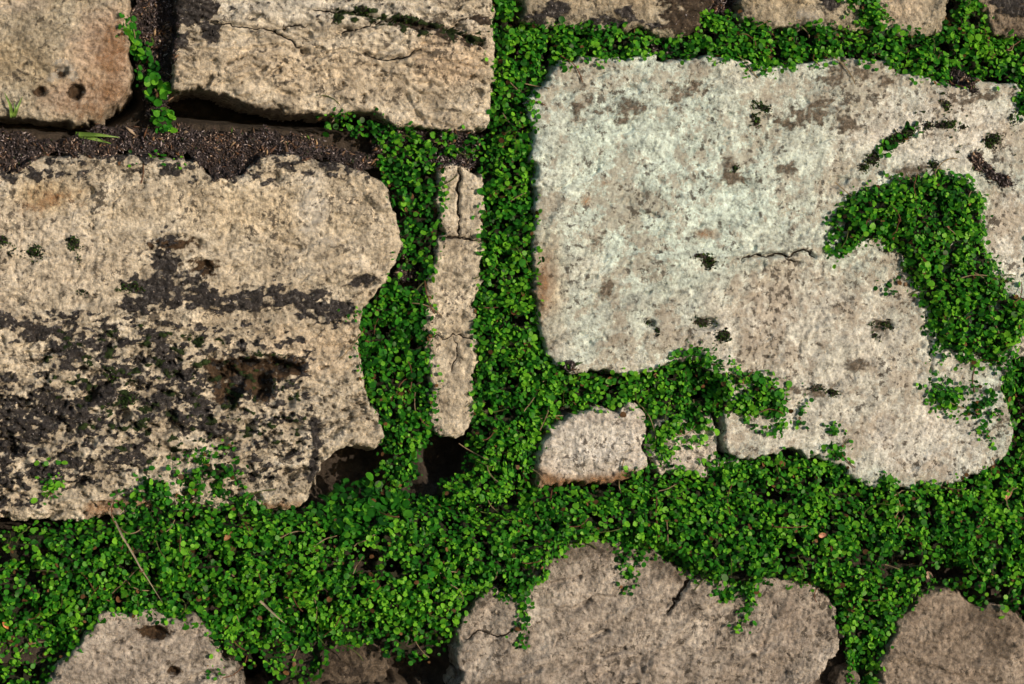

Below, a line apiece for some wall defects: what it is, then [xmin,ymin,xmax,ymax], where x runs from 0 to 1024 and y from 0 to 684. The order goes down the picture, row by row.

crack [741,249,815,262]